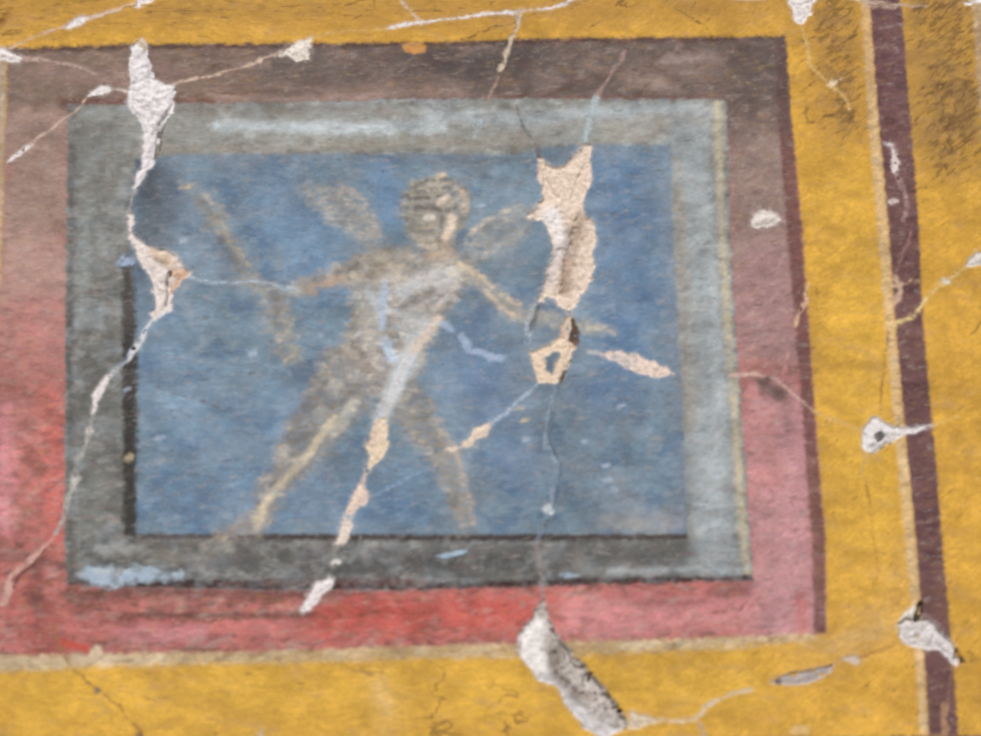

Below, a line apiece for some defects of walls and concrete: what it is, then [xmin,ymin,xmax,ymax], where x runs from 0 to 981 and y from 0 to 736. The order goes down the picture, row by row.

flaking render [0,43,101,79]
crack [4,81,128,167]
crack [4,0,133,52]
flaking render [113,36,300,324]
crack [170,0,722,160]
flaking render [522,139,677,387]
flaking render [785,0,854,113]
crack [879,138,981,332]
crack [0,302,174,609]
crack [49,282,564,736]
flaking render [725,327,961,575]
flaking render [510,594,968,736]